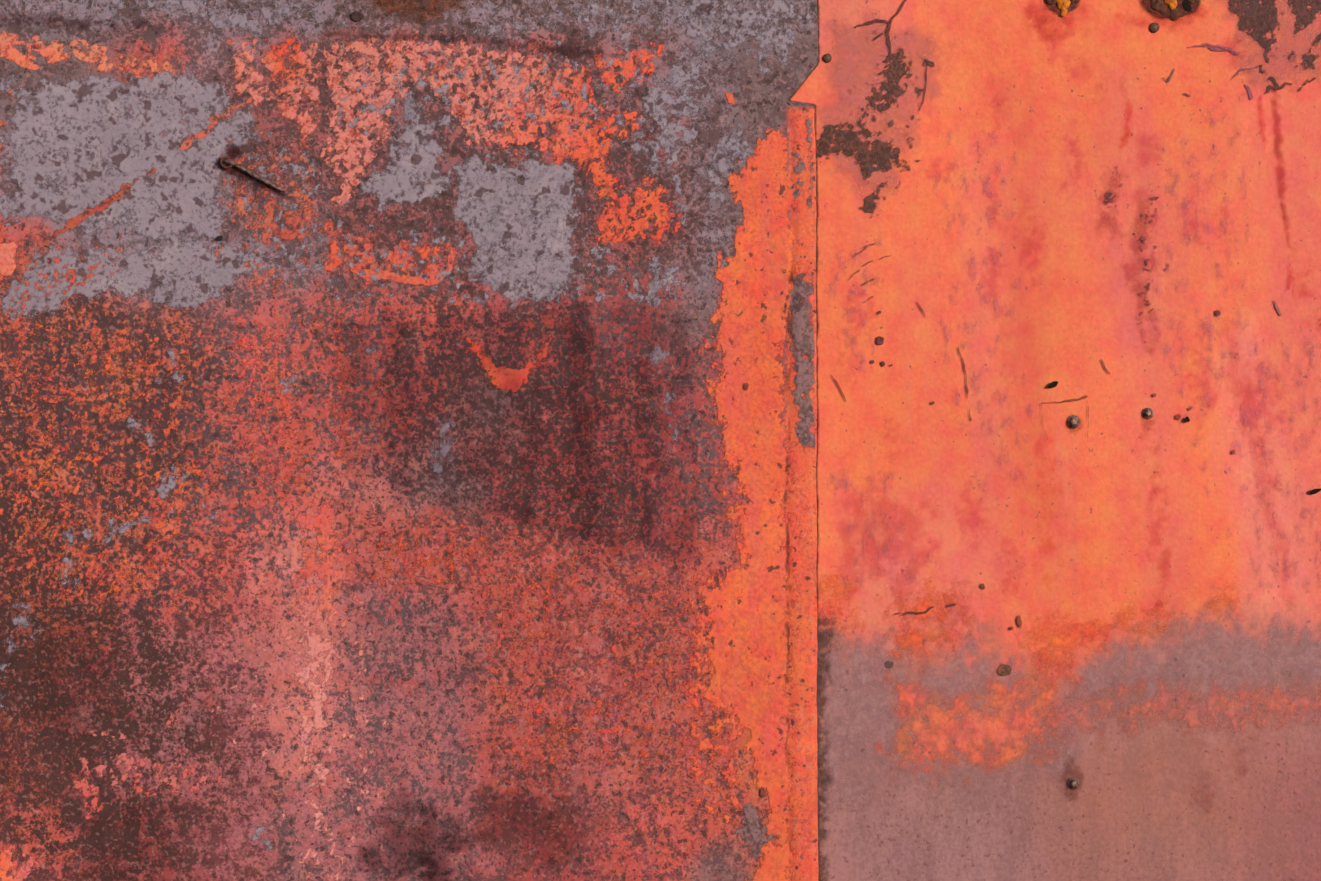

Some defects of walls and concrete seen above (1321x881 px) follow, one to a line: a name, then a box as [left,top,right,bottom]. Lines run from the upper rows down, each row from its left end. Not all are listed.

corrosion [787,0,820,105]
spalling [1203,0,1321,100]
spalling [816,48,934,217]
corrosion [0,241,17,281]
corrosion [1134,184,1169,314]
peeling [0,0,811,881]
corrosion [814,104,833,881]
corrosion [998,664,1012,676]